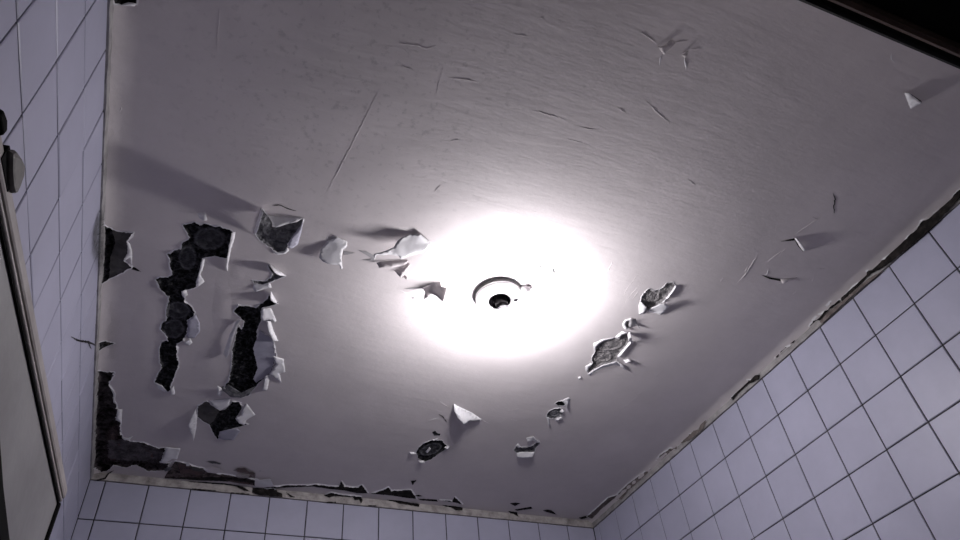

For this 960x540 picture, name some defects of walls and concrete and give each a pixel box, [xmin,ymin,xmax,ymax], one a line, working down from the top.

peeling [905,93,922,109]
flaking render [102,222,141,284]
peeling [319,234,447,302]
flaking render [153,212,235,395]
flaking render [188,208,304,441]
peeling [578,282,676,380]
flaking render [93,370,180,481]
flaking render [410,403,487,463]
peeling [513,436,540,458]
peeling [546,398,570,426]